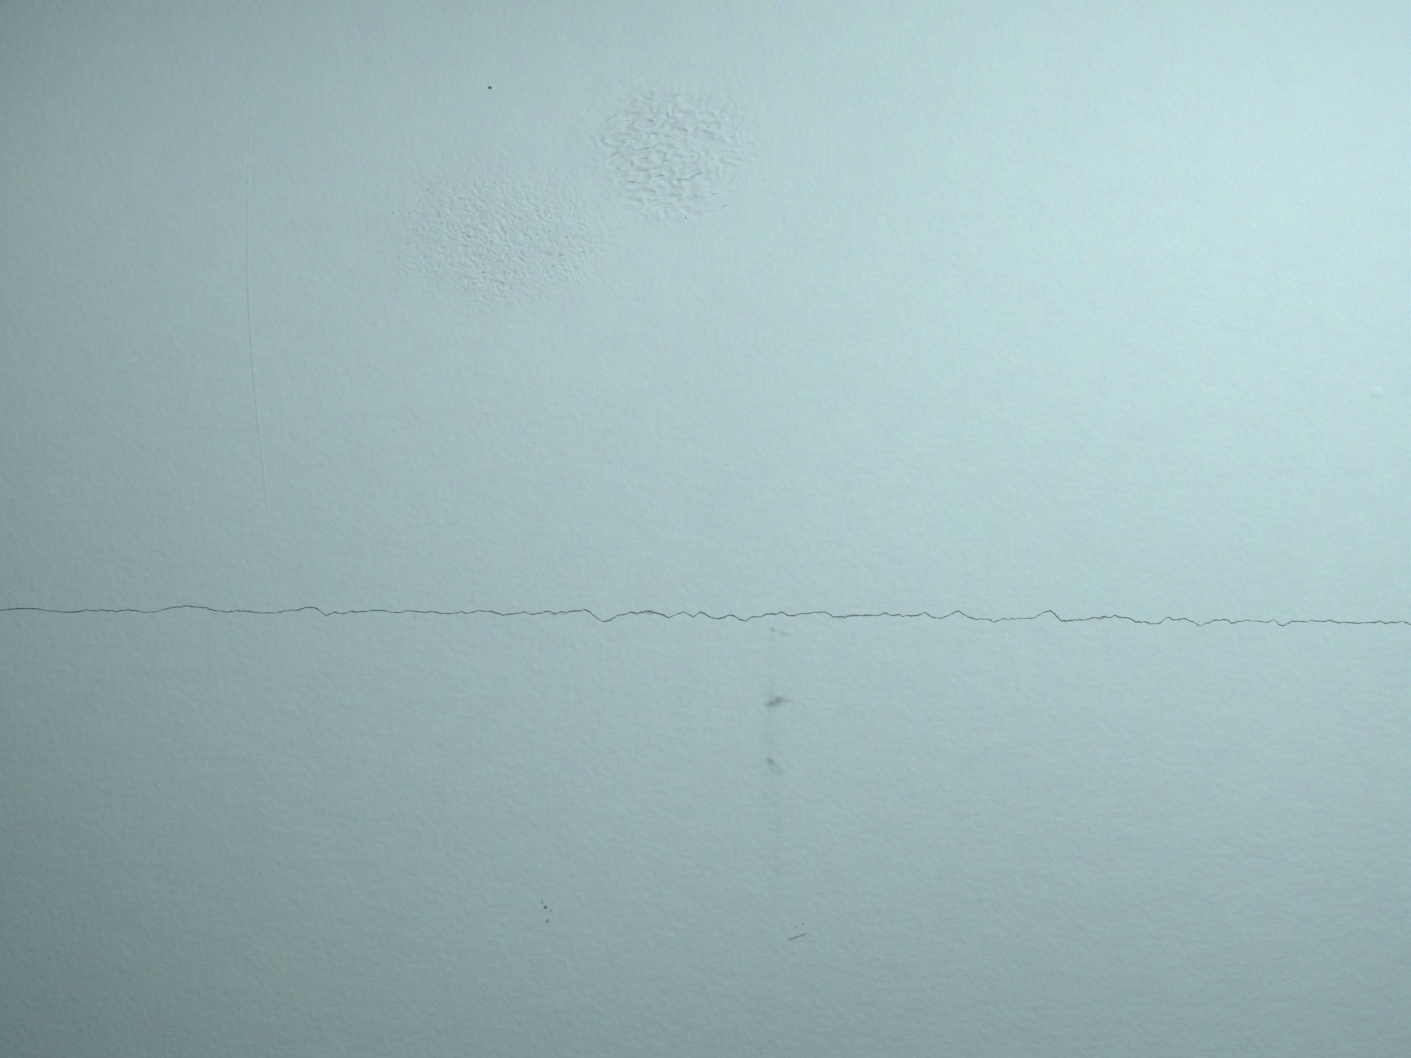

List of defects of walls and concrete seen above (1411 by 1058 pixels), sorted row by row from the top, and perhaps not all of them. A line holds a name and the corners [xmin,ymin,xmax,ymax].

crack [0,605,1411,626]